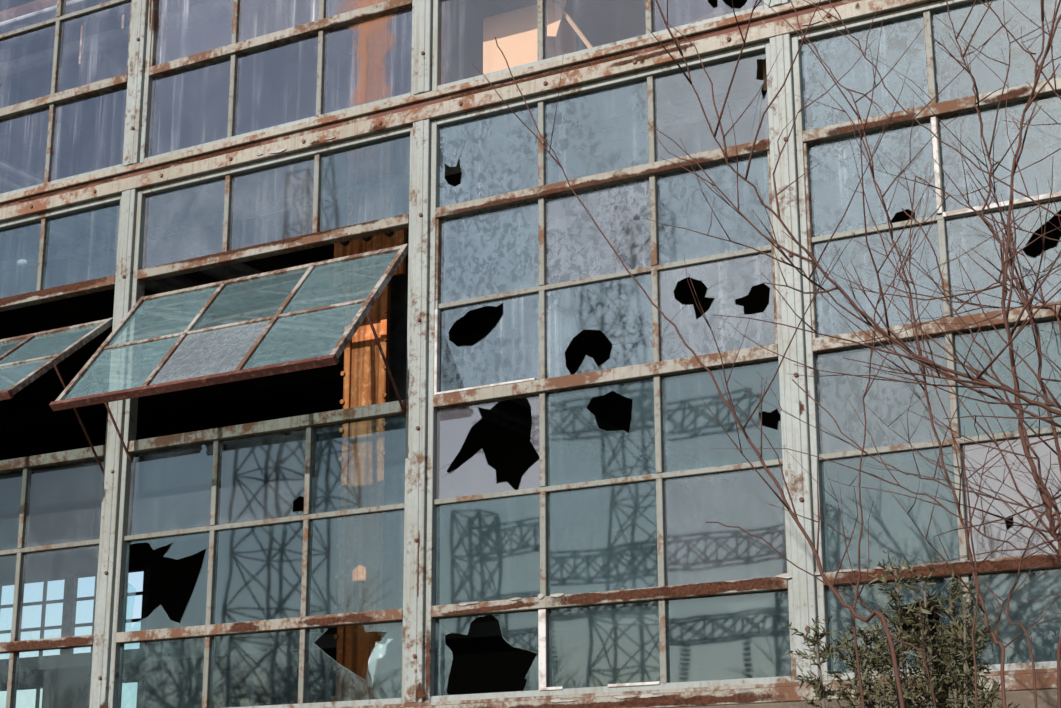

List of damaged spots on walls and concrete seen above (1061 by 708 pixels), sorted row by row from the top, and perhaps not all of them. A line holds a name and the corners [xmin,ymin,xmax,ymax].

corrosion [447,20,755,101]
corrosion [150,142,260,170]
corrosion [831,554,1061,584]
corrosion [553,577,783,605]
corrosion [509,692,772,708]